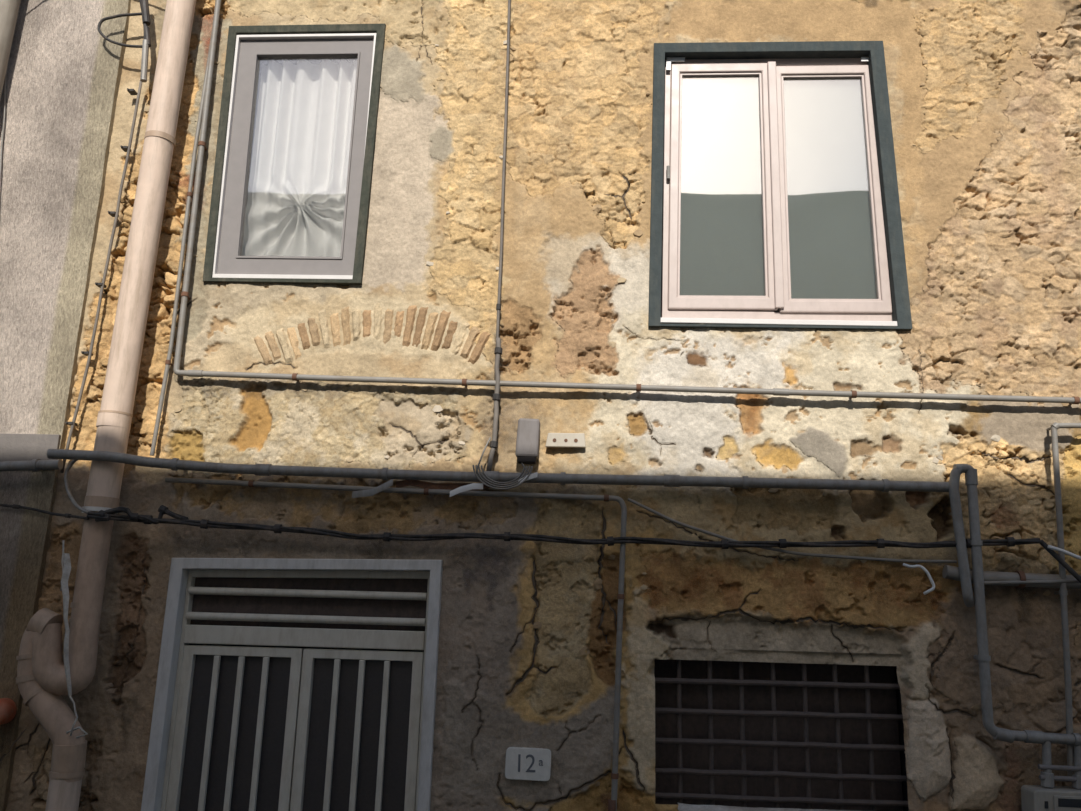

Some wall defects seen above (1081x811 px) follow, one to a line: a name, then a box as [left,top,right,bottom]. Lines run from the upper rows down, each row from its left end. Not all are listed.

spalling [62,140,144,467]
spalling [124,0,674,539]
spalling [897,0,1081,408]
spalling [695,386,893,539]
spalling [851,434,902,458]
spalling [905,426,1081,573]
crack [507,558,556,695]
crack [598,510,617,644]
spalling [527,491,974,718]
crack [650,589,904,662]
crack [16,724,51,794]
crack [461,657,645,811]